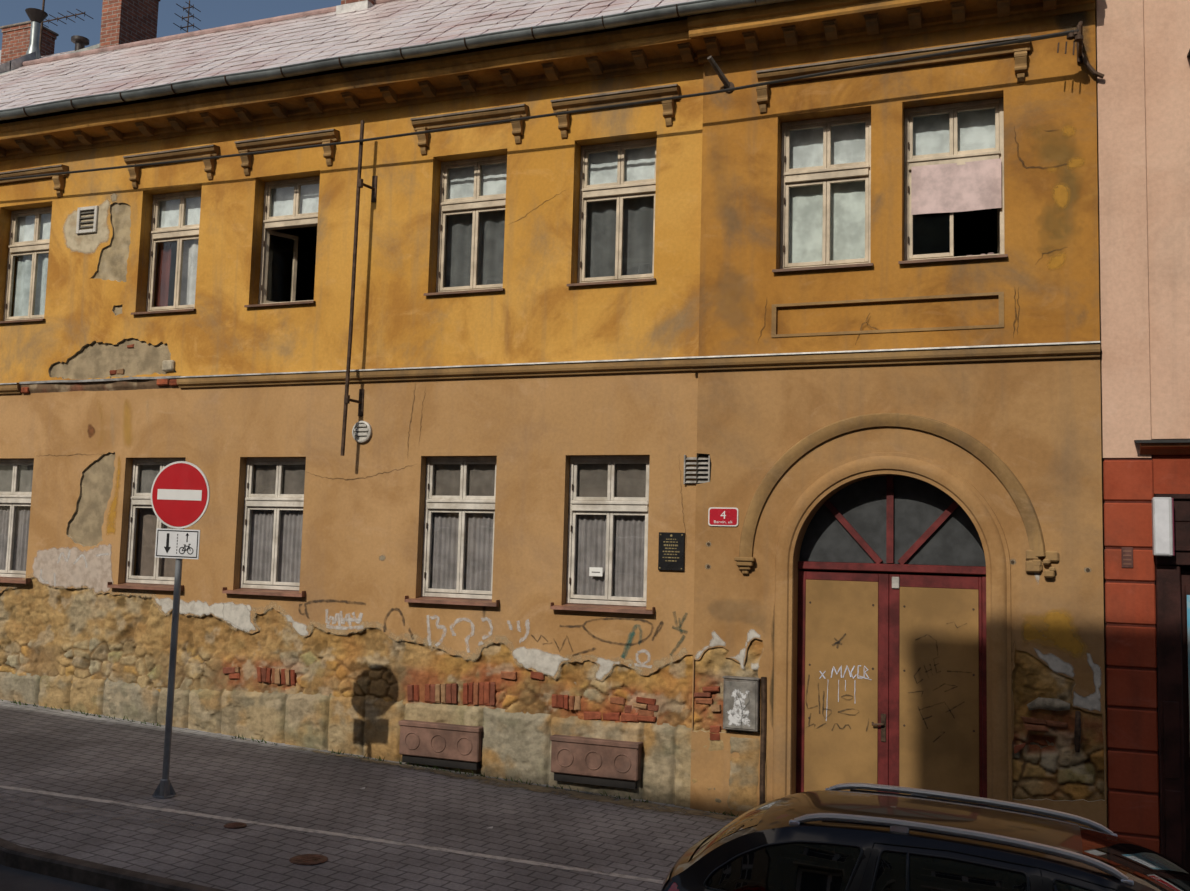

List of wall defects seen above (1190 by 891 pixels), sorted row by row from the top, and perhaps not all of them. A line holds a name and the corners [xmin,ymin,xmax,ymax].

peeling [64,193,131,282]
flaking render [51,338,178,386]
flaking render [0,452,764,740]
flaking render [1012,644,1107,803]